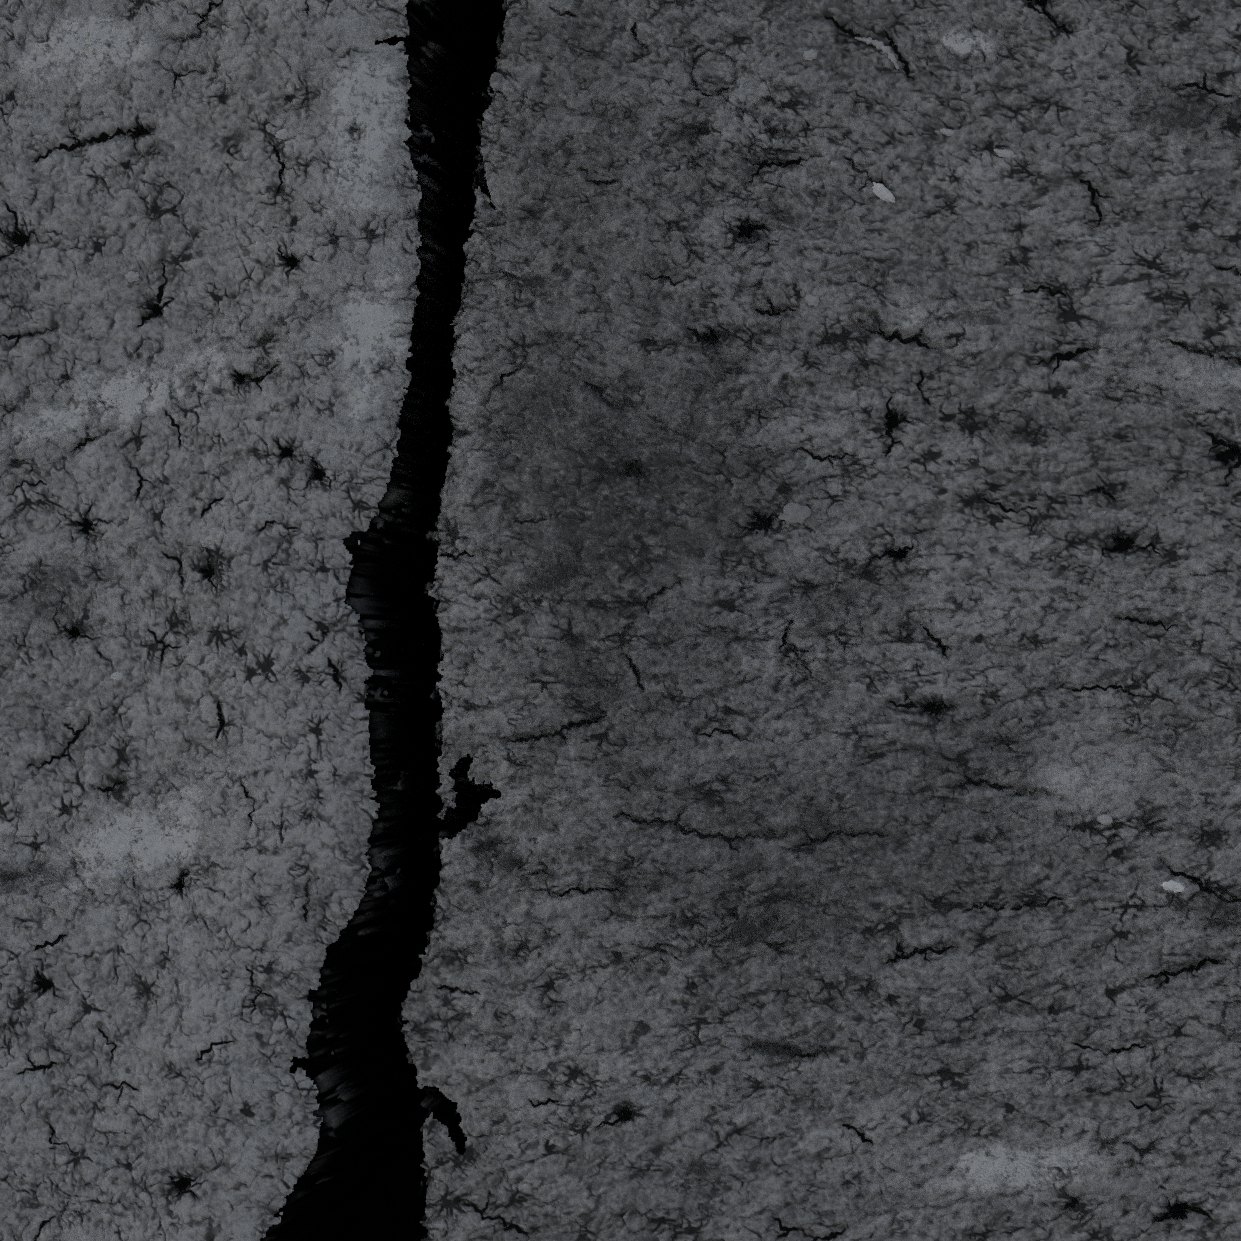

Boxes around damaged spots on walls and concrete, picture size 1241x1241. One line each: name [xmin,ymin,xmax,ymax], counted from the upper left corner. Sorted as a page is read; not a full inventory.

crack [33,128,144,162]
crack [249,364,278,391]
crack [488,368,521,402]
crack [258,0,509,1241]
crack [215,701,225,739]
crack [241,782,255,826]
crack [245,965,273,1013]
crack [195,1041,234,1061]